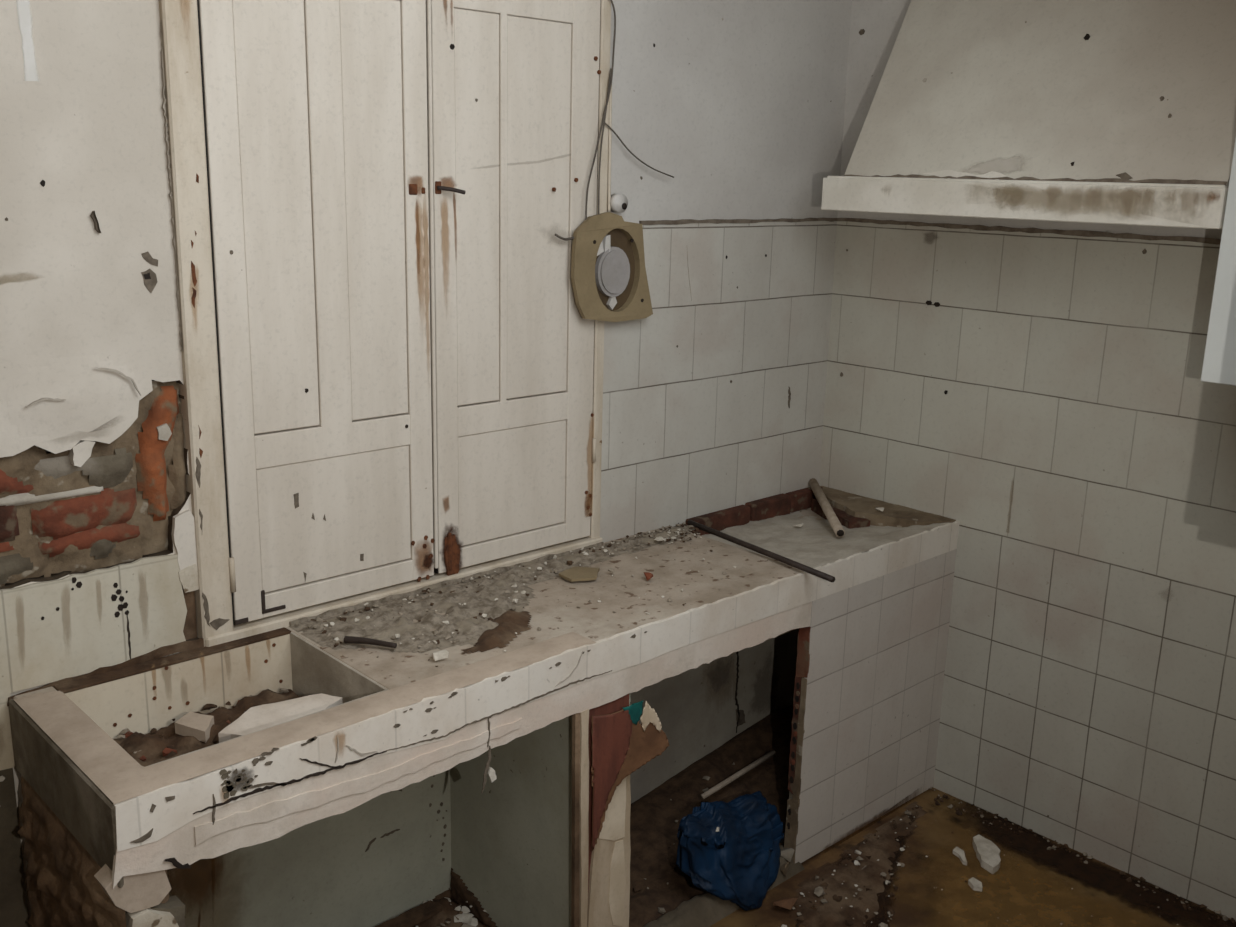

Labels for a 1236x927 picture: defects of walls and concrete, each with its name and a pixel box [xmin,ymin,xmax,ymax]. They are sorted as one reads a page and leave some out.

corrosion [411,177,422,269]
corrosion [442,179,457,240]
flaking render [0,381,230,640]
corrosion [411,527,462,582]
crack [193,651,612,825]
peeling [130,828,153,843]
damp [167,857,222,927]